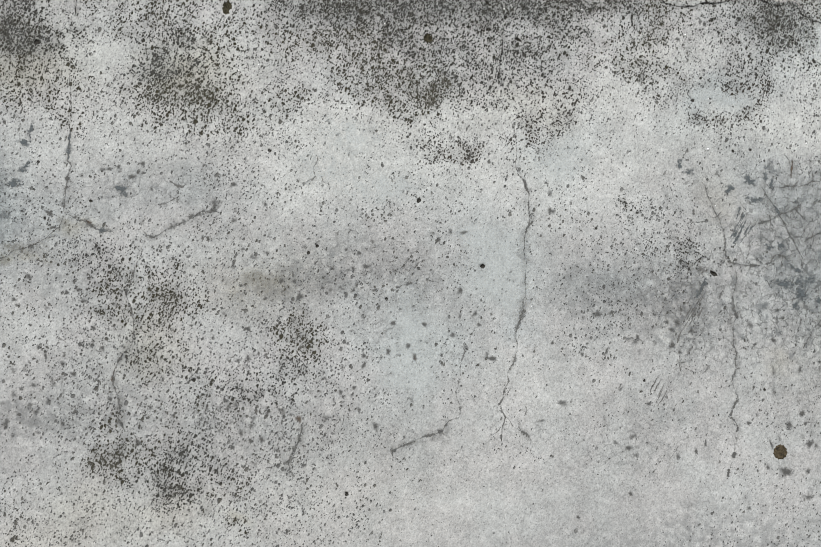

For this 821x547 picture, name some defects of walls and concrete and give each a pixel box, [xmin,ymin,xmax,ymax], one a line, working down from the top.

crack [662,0,729,8]
crack [760,0,821,24]
crack [498,28,530,256]
crack [496,277,526,439]
crack [701,161,821,477]
rust [773,444,787,459]